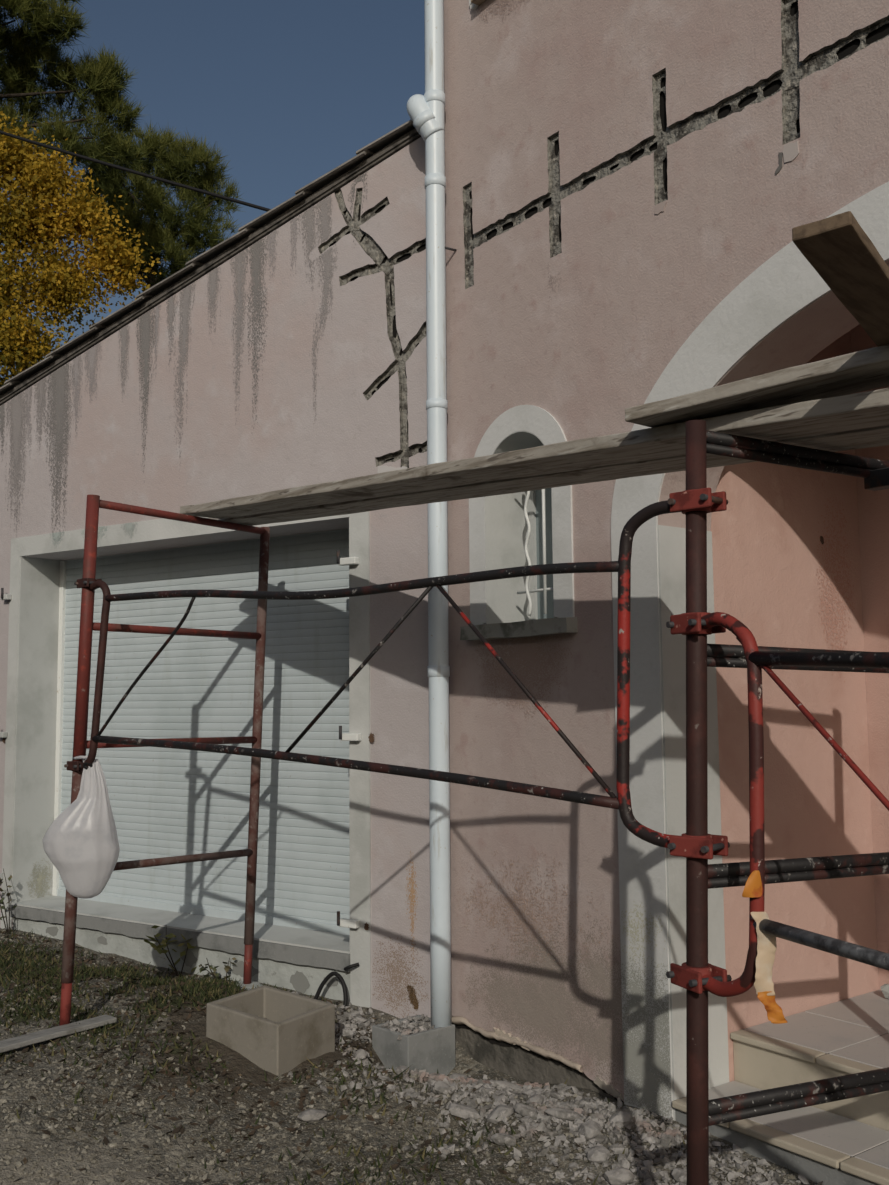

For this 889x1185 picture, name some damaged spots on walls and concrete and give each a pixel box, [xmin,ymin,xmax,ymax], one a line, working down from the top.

peeling [775,141,799,175]
water stain [118,194,338,479]
water stain [0,343,102,554]
water stain [372,934,429,1018]